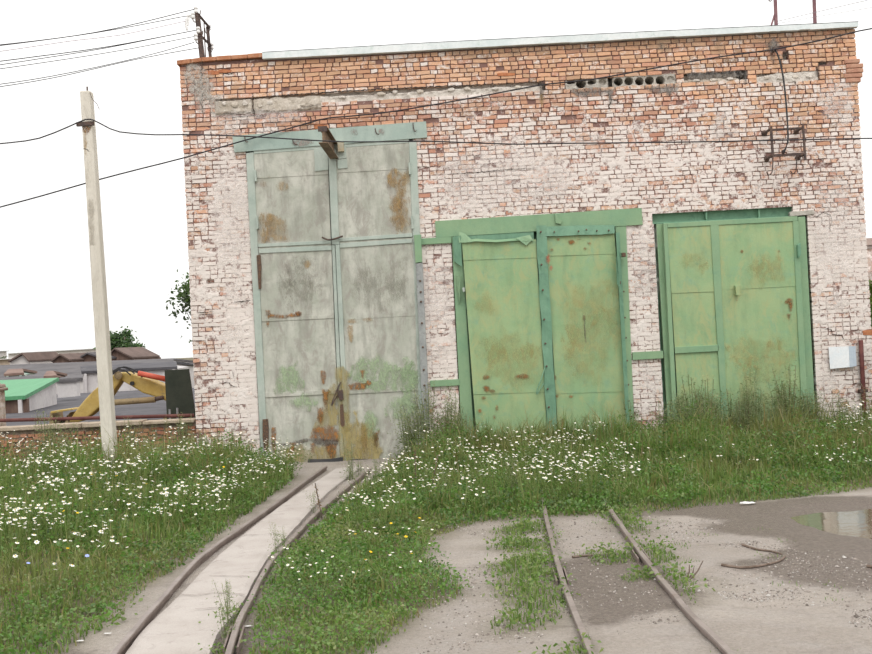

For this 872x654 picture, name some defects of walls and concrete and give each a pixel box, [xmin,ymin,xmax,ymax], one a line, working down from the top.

spalling [214,72,545,116]
corrosion [271,371,339,458]